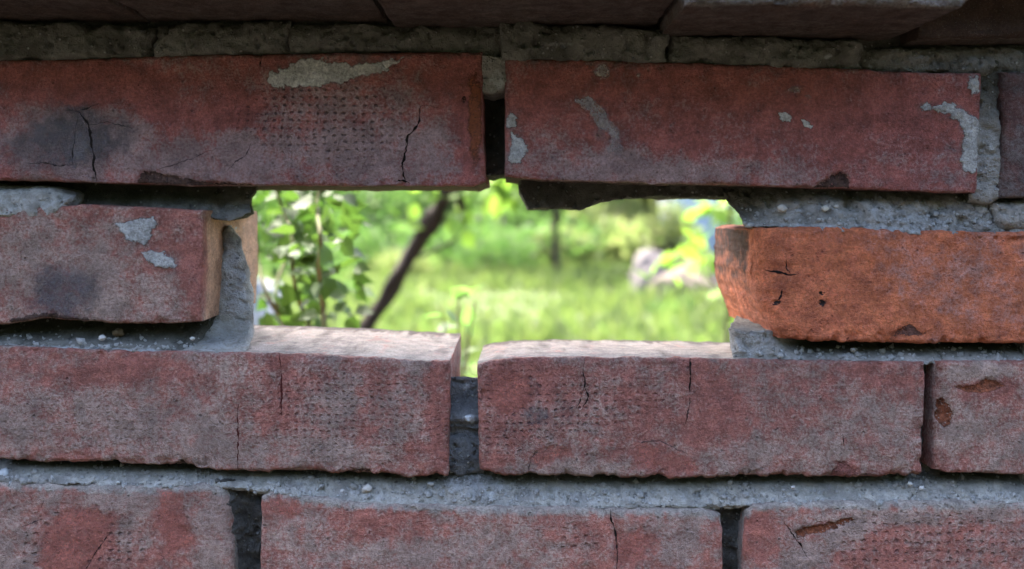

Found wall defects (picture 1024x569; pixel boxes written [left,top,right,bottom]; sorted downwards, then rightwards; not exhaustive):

crack [30,104,132,176]
crack [396,105,436,183]
crack [277,354,285,414]
crack [576,358,589,409]
crack [684,358,692,423]
spalling [934,398,953,427]
spalling [956,378,1004,393]
crack [610,512,618,568]
spalling [795,517,855,538]